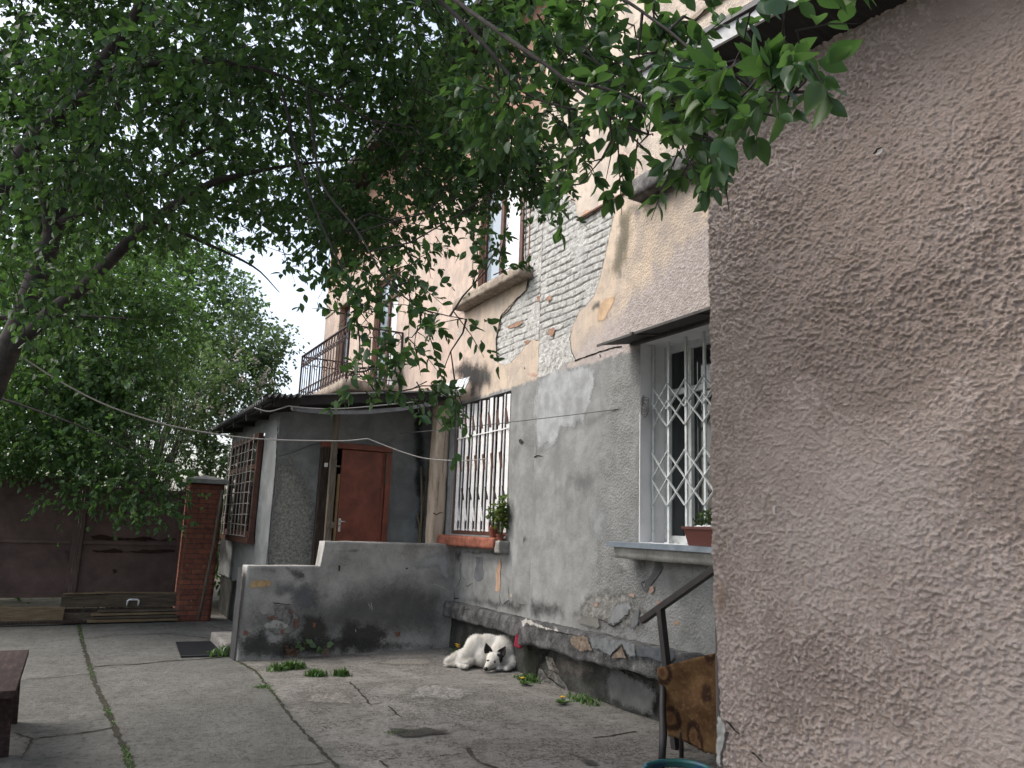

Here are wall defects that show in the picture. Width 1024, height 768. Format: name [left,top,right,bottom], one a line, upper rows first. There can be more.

peeling [496,181,615,377]
spalling [268,602,299,657]
leakage [218,539,434,661]
spalling [574,561,662,633]